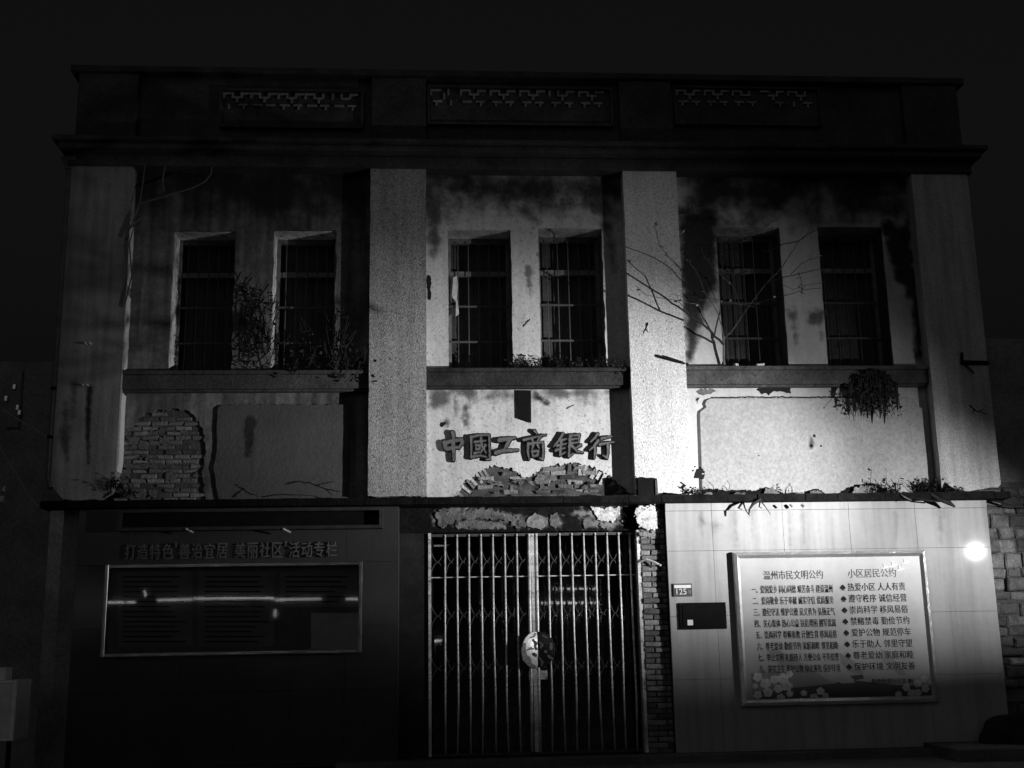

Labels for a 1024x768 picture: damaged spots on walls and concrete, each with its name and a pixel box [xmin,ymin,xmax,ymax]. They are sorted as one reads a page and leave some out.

water stain [426,175,621,255]
water stain [679,177,922,361]
flaking render [113,413,205,501]
flaking render [435,464,674,538]